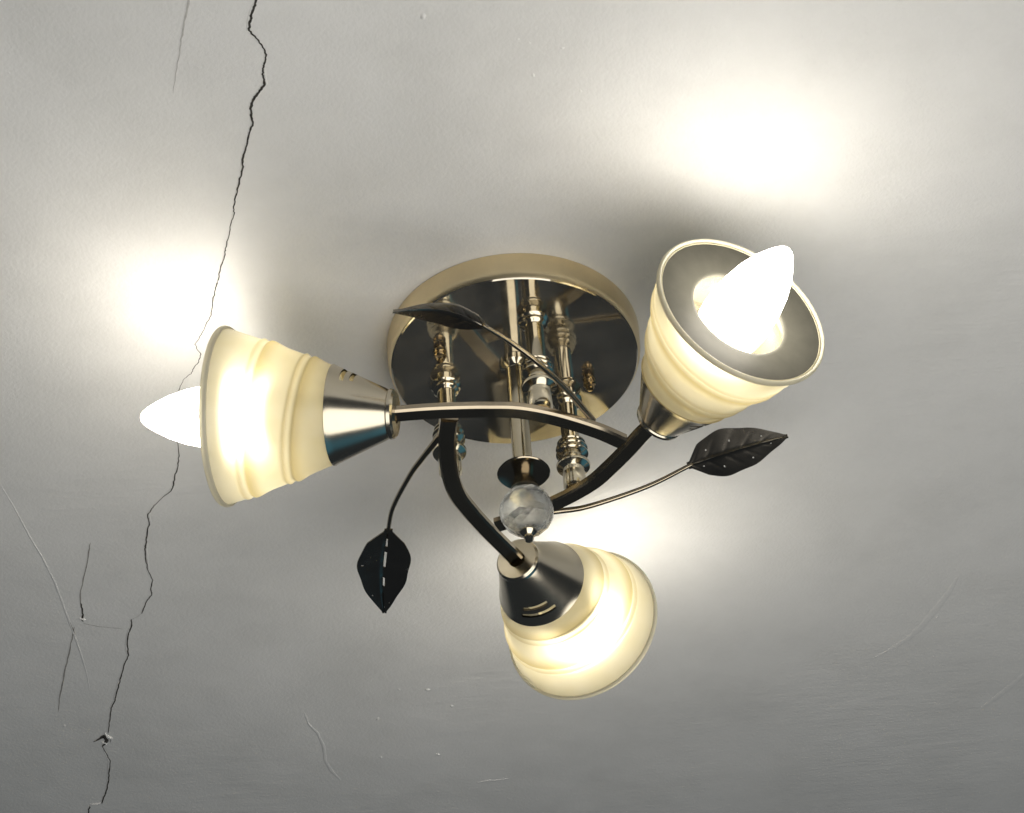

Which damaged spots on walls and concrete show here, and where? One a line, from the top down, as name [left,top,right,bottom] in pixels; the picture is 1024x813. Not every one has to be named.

crack [173,0,190,91]
crack [178,0,267,391]
crack [79,441,180,813]